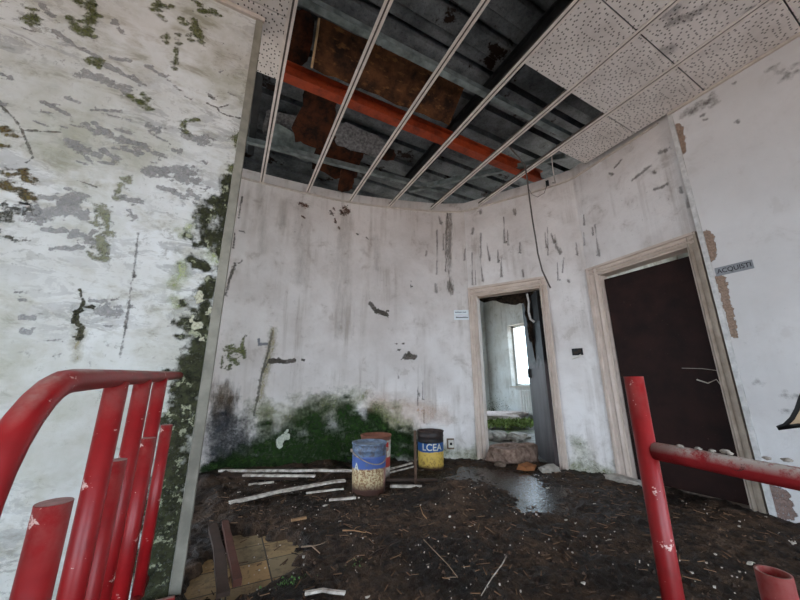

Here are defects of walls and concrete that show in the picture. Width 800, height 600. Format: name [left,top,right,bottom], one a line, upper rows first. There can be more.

peeling [52,29,147,97]
peeling [39,96,215,200]
peeling [675,123,686,154]
water stain [0,190,37,241]
peeling [2,187,98,251]
peeling [118,195,144,221]
peeling [703,230,717,262]
spalling [368,301,389,318]
peeling [715,275,738,338]
water stain [209,381,248,463]
peeling [769,485,798,521]